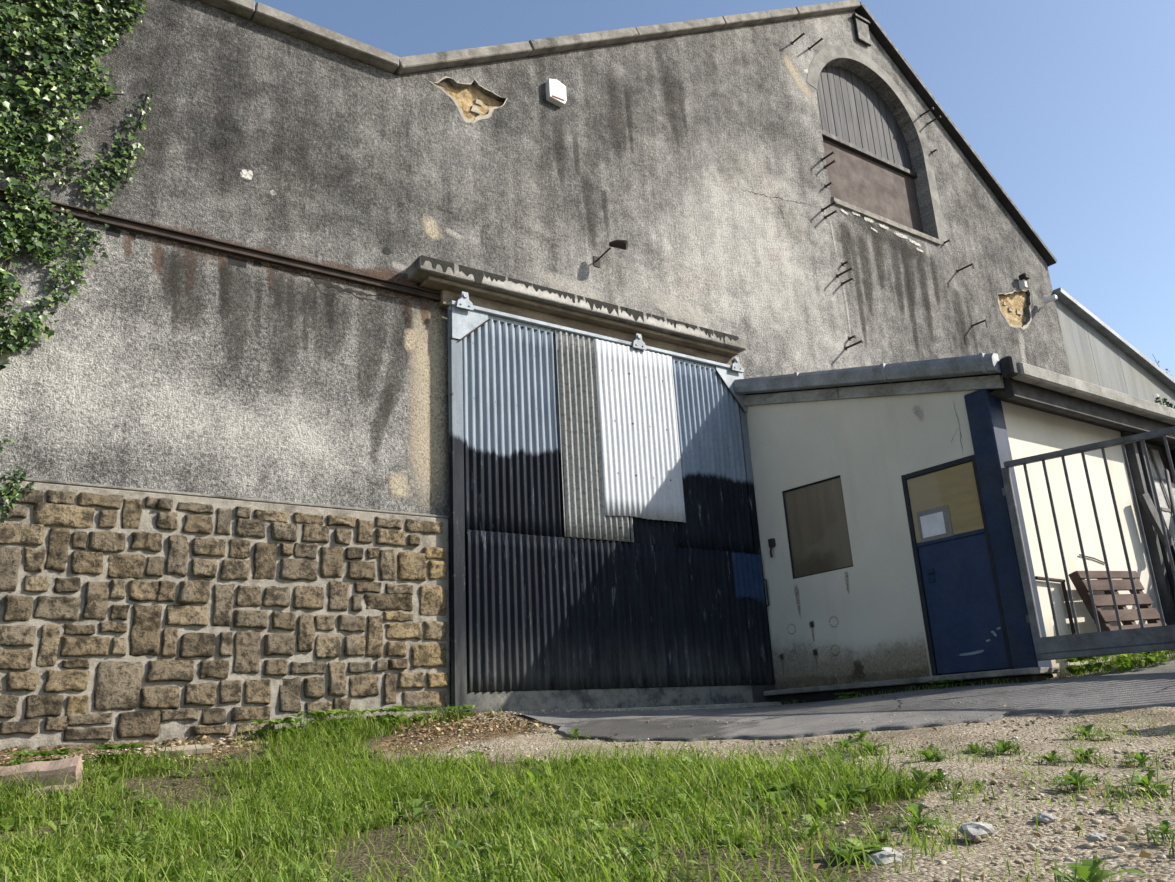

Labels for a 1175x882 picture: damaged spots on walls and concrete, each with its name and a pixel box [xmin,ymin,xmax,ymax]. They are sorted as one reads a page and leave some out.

spalling [430,76,508,123]
corrosion [154,228,443,337]
crack [261,264,395,302]
peeling [421,255,739,343]
damp [830,215,940,349]
spalling [997,289,1032,330]
flaking render [389,312,446,497]
peeling [960,627,1001,656]
damp [772,646,930,690]